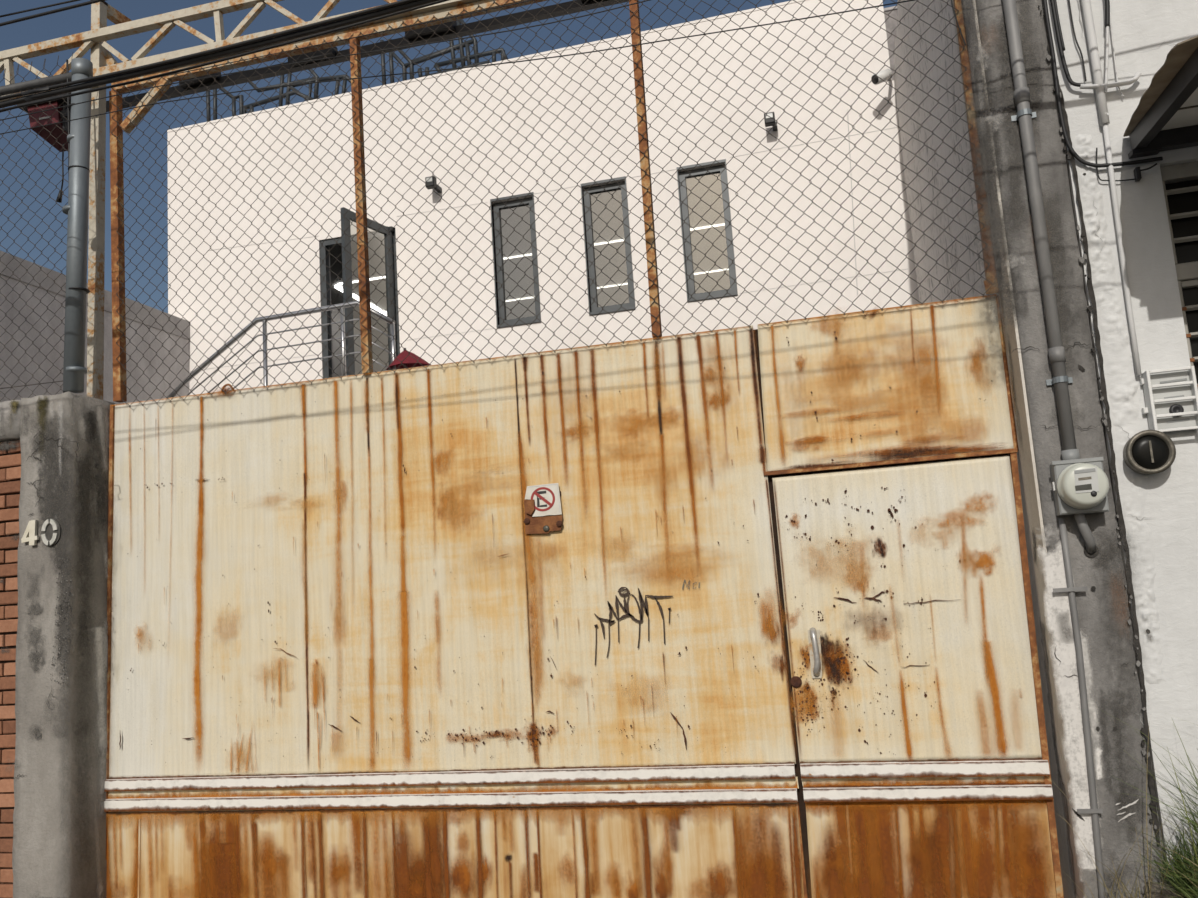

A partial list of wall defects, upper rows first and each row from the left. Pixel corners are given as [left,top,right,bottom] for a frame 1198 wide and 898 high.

leakage [963,0,1039,321]
leakage [0,395,109,826]
rust [104,294,1054,898]
leakage [1095,543,1142,838]